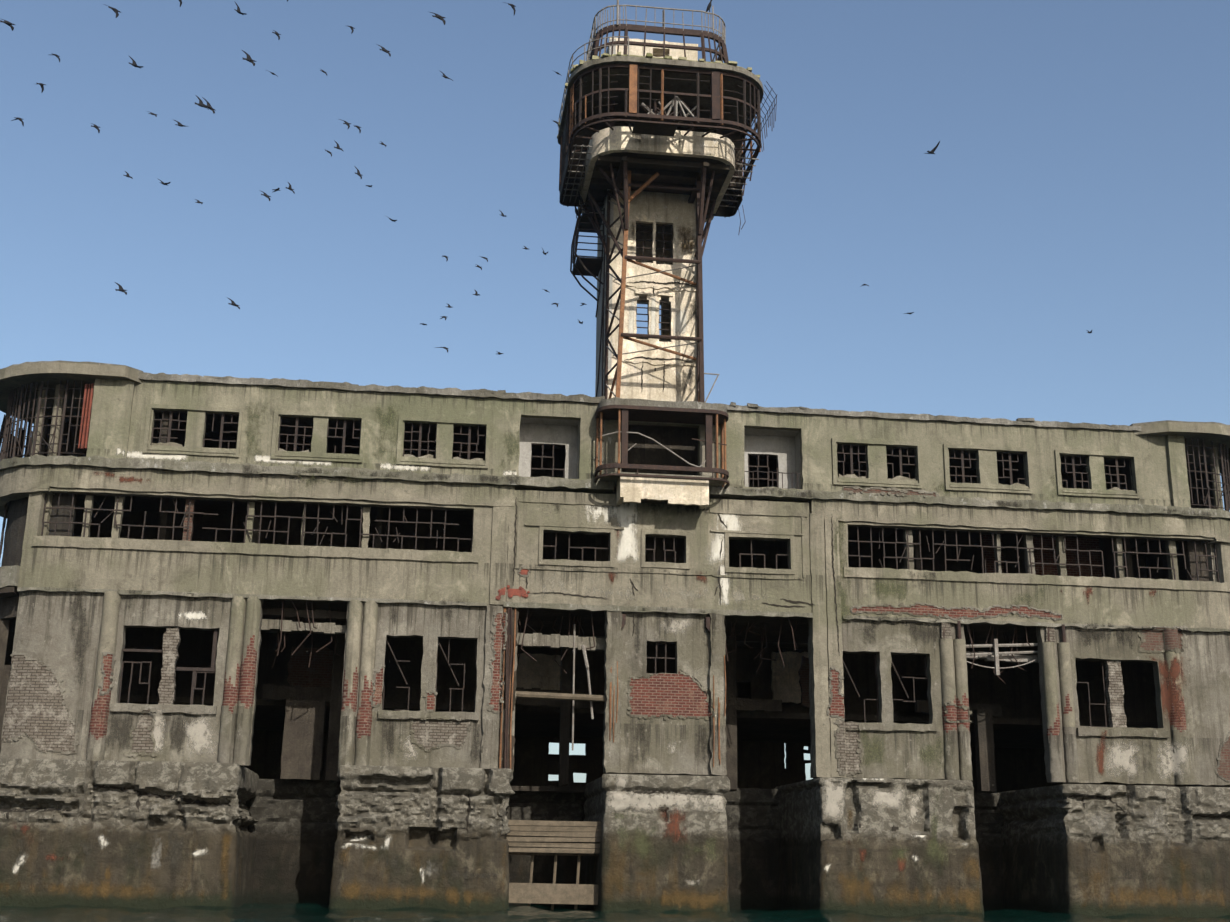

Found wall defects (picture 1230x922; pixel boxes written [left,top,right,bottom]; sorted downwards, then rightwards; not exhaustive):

damp [244,408,266,480]
damp [587,503,637,560]
damp [664,505,745,640]
spalling [850,602,1063,684]
spalling [2,653,79,755]
flaking render [627,671,715,720]
spalling [1215,731,1230,782]